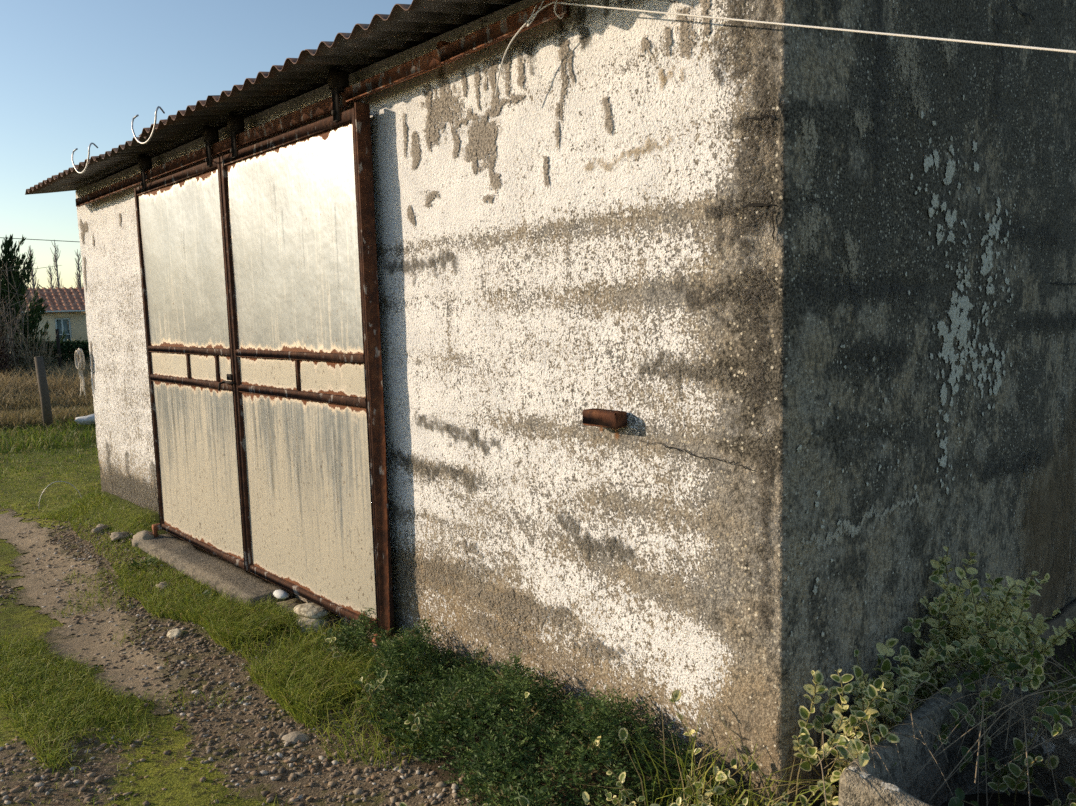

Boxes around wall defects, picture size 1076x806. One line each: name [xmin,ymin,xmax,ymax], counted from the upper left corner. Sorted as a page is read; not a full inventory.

damp [492,0,590,79]
damp [601,0,635,17]
damp [862,0,896,216]
damp [636,0,774,411]
damp [394,445,480,495]
damp [415,408,501,456]
damp [556,512,634,564]
damp [754,438,773,636]